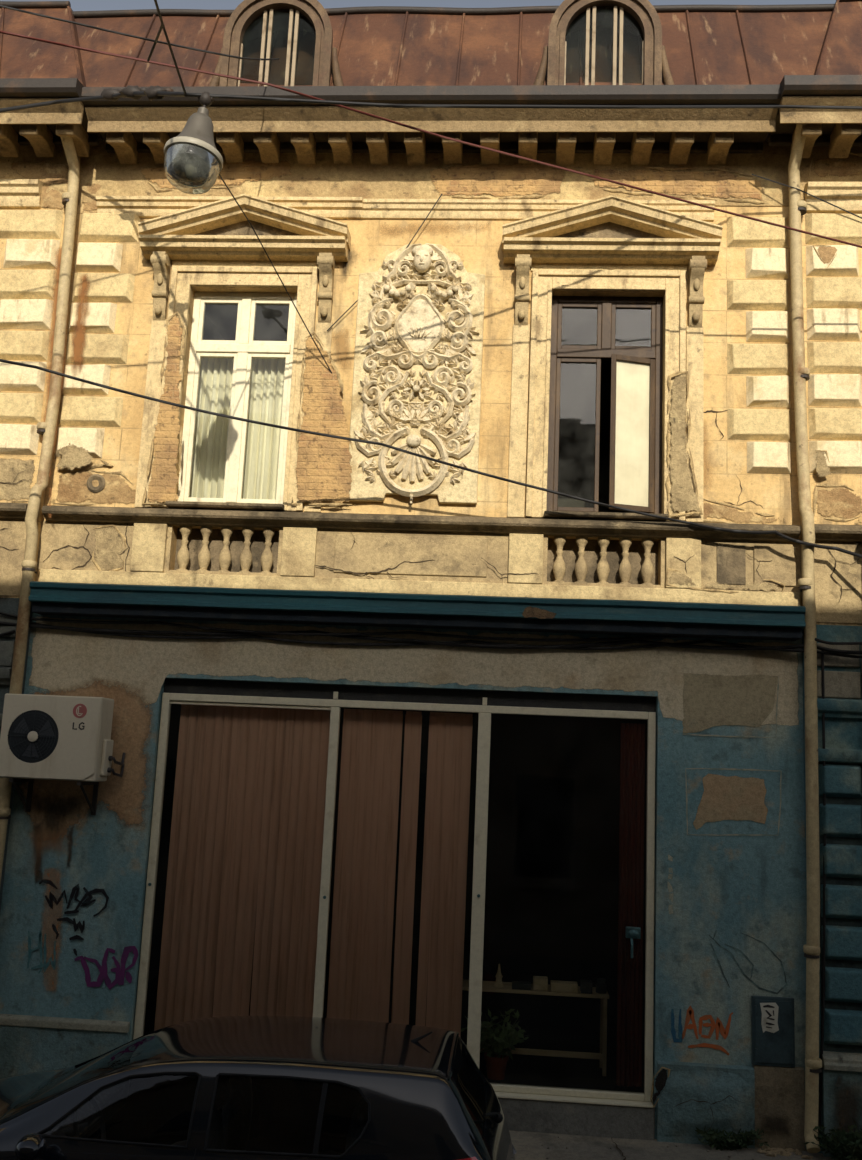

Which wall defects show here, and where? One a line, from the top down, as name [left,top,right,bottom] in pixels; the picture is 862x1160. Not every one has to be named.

flaking render [54,311,186,506]
flaking render [291,332,353,507]
crack [43,523,130,571]
crack [315,530,435,579]
crack [828,549,859,601]
peeling [522,606,557,619]
peeling [682,673,779,738]
peeling [685,768,782,836]